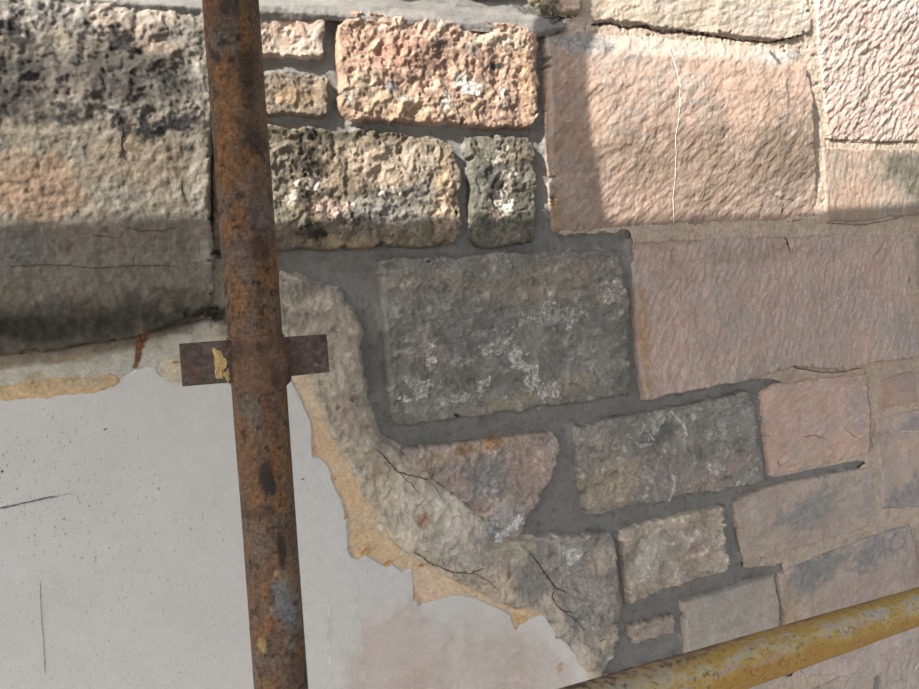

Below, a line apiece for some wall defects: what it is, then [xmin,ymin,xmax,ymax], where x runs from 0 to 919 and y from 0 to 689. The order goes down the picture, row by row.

spalling [207,308,228,341]
corrosion [133,330,148,368]
peeling [0,374,120,401]
peeling [158,354,182,383]
crack [376,449,444,501]
spalling [279,270,607,679]
crack [529,552,583,629]